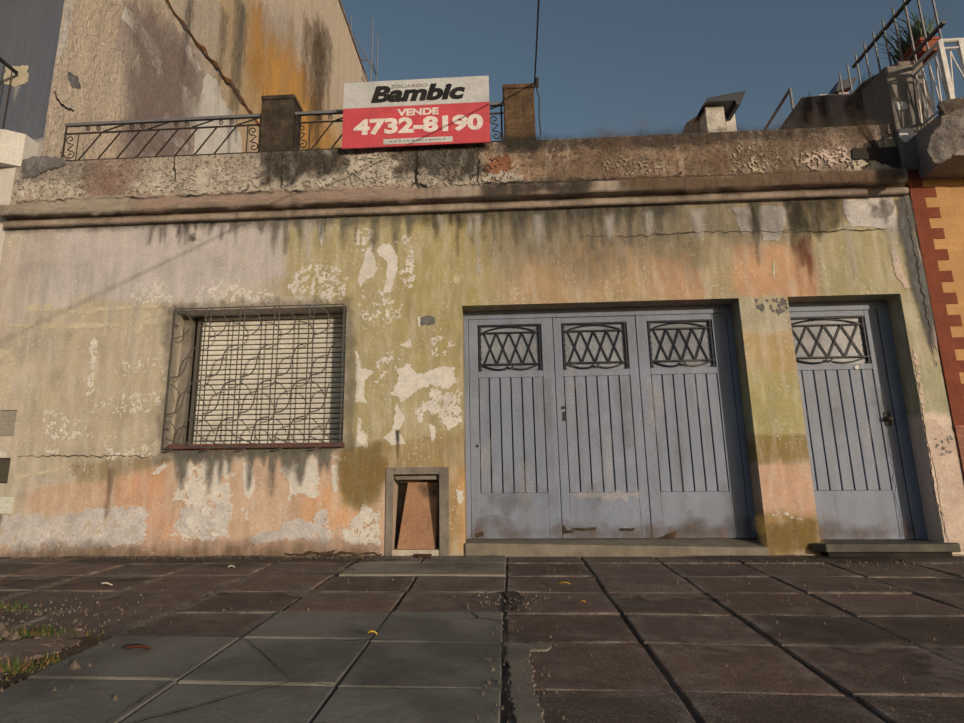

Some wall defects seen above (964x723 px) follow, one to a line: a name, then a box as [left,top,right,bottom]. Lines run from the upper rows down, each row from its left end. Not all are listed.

crack [165,0,259,124]
peeling [4,149,524,212]
damp [394,143,490,180]
damp [571,128,903,189]
spalling [926,97,964,164]
damp [248,214,429,245]
damp [881,195,935,347]
peeling [355,336,463,449]
peeling [152,457,255,542]
damp [176,445,386,496]
peeling [279,452,346,501]
crack [106,636,340,723]